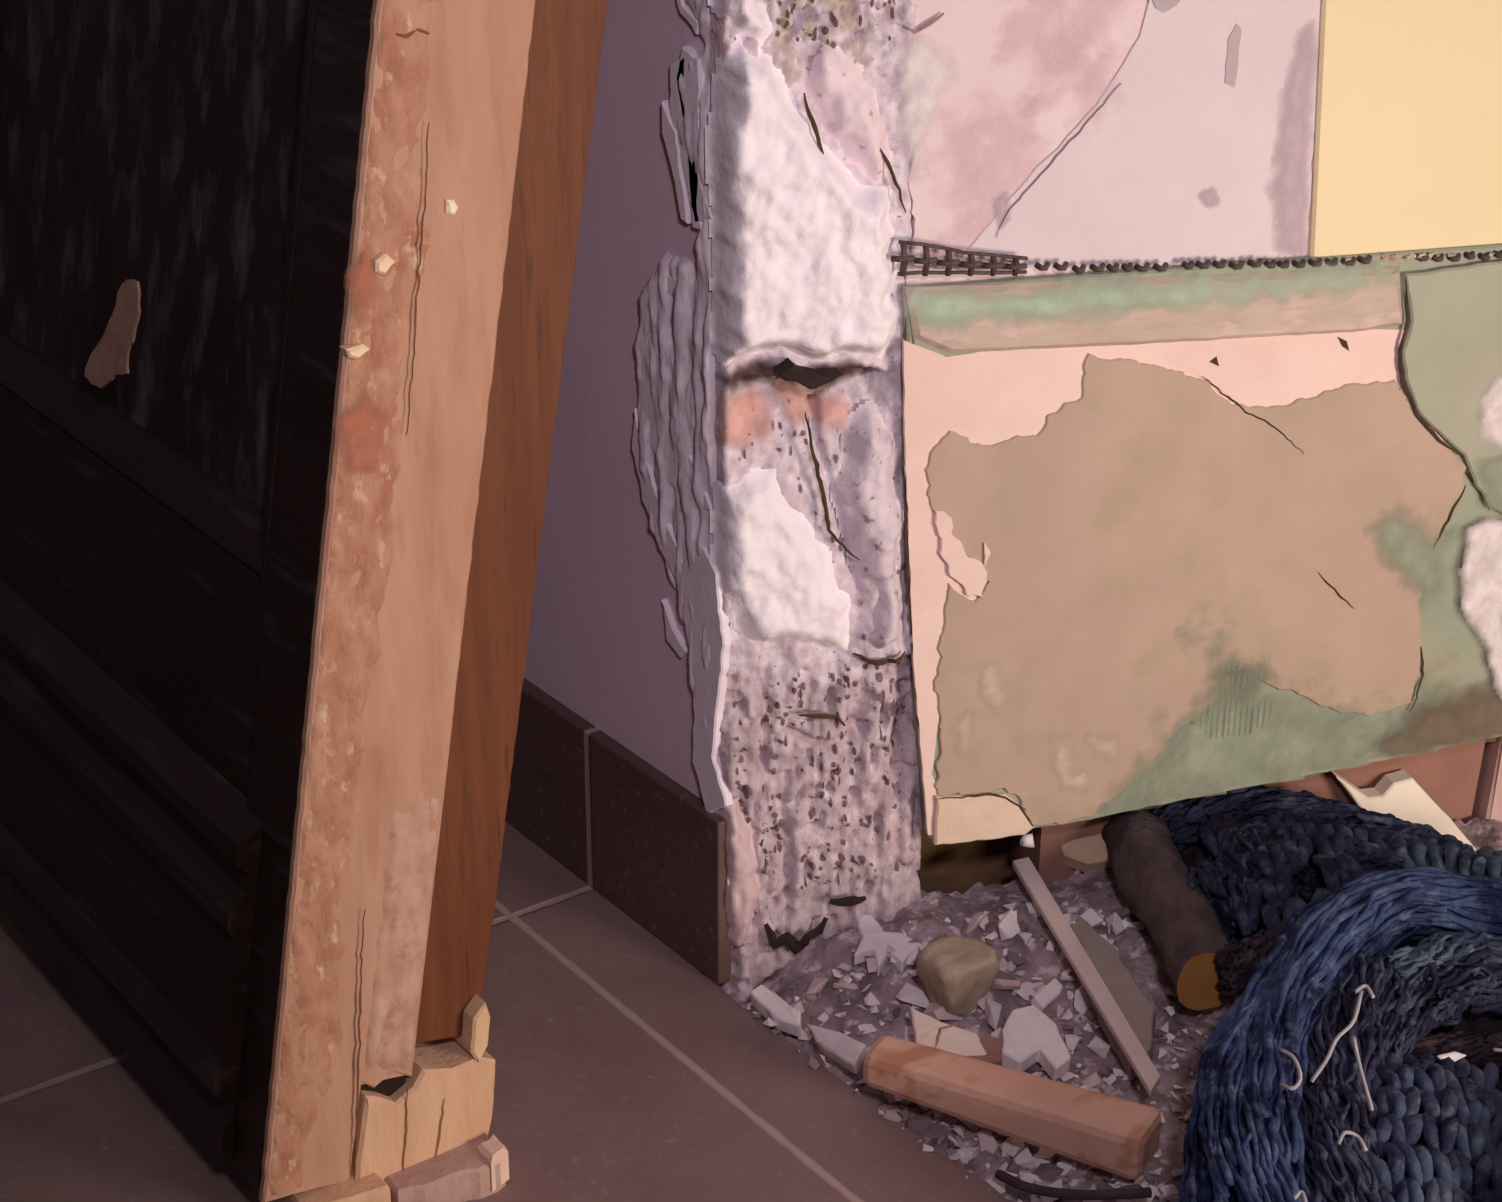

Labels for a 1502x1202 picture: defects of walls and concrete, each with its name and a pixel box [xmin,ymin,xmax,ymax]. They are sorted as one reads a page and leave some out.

crack [805,412,860,560]
peeling [632,0,1502,1000]
crack [1434,471,1490,547]
crack [1409,647,1424,712]